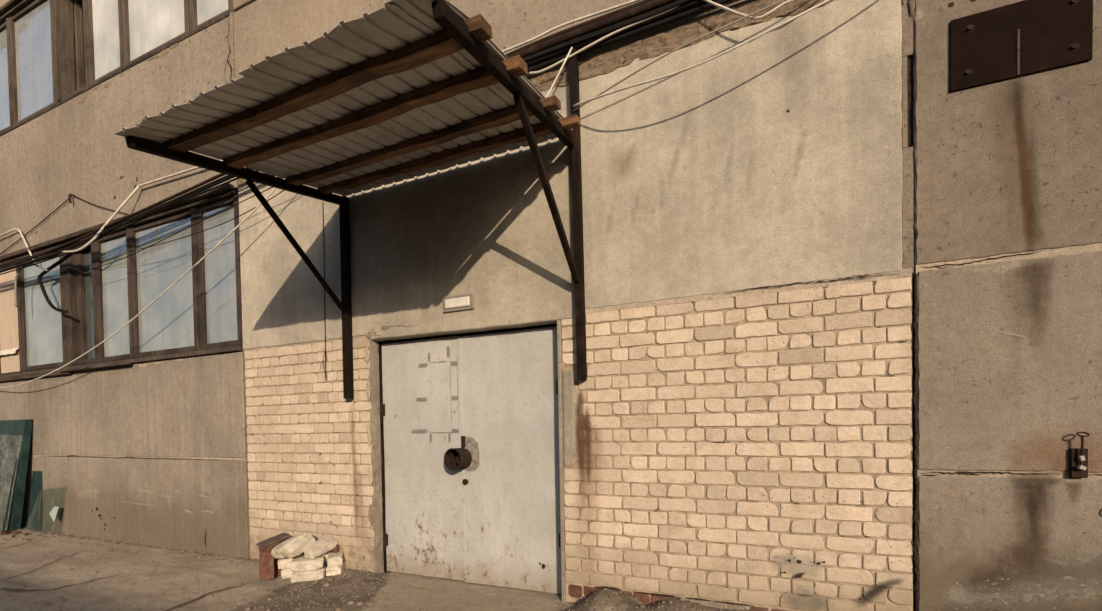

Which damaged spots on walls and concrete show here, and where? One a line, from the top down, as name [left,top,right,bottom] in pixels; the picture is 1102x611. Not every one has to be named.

crack [224,23,232,80]
rust [1018,108,1032,238]